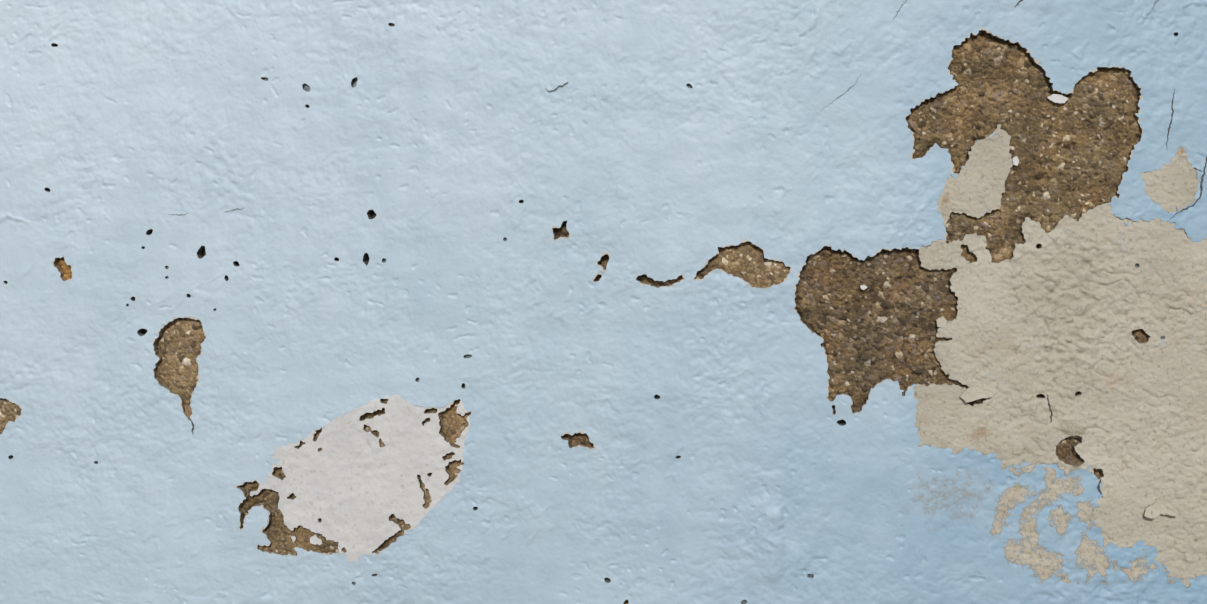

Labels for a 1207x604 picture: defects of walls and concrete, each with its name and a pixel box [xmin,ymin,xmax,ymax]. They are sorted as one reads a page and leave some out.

peeling [57,258,72,281]
peeling [694,31,1207,588]
spalling [0,398,22,434]
spalling [142,318,206,435]
peeling [237,384,471,563]
peeling [563,433,594,447]